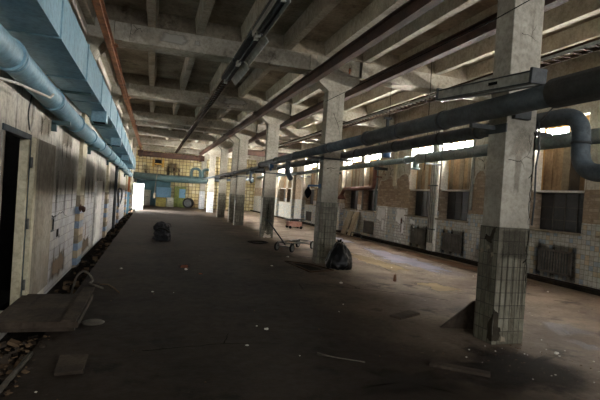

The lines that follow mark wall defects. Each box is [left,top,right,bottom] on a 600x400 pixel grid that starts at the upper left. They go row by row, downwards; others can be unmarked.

peeling [487,309,505,342]